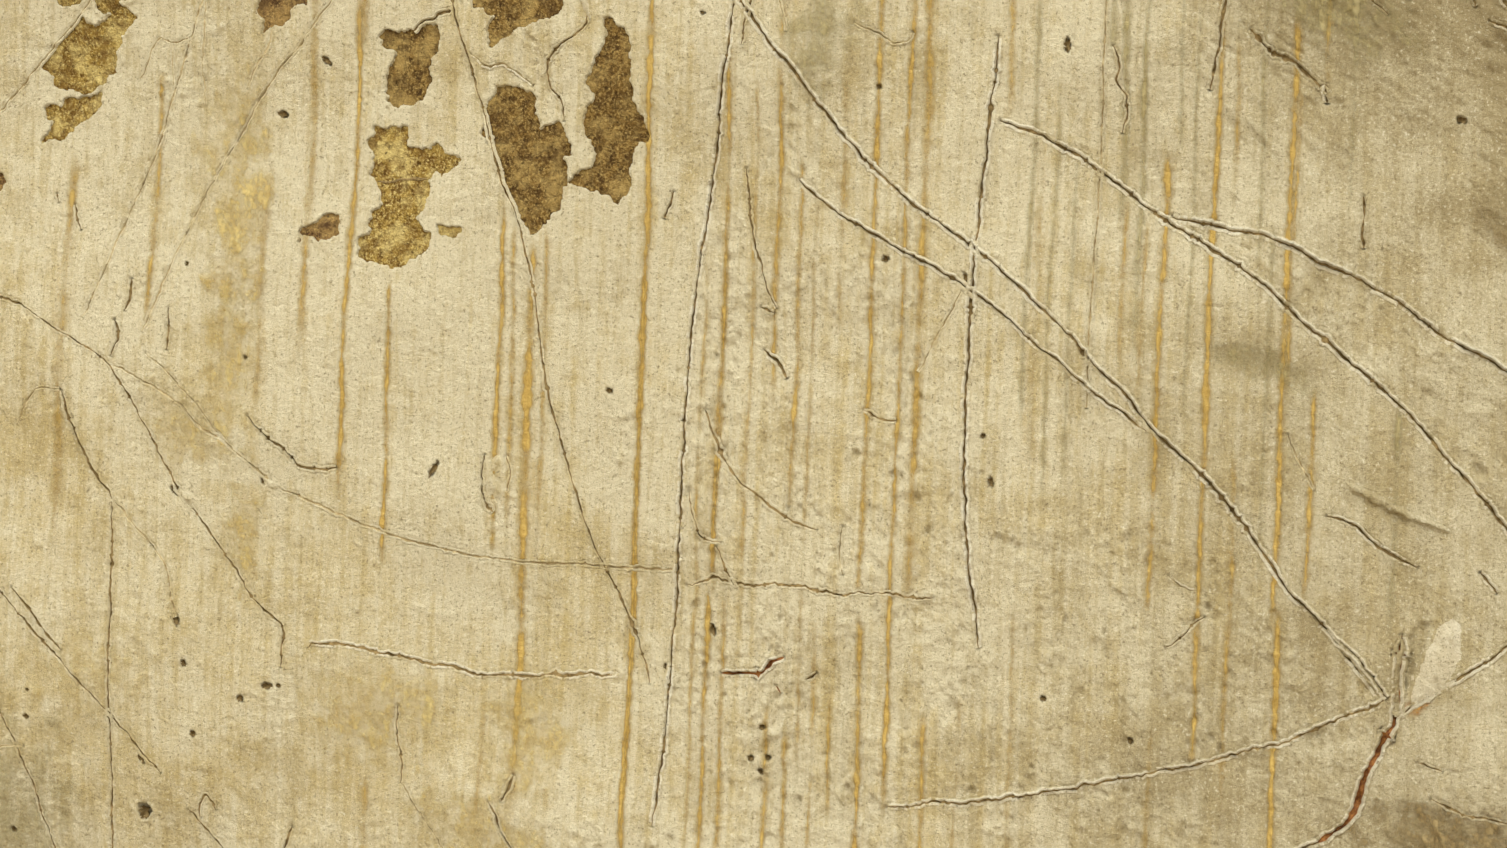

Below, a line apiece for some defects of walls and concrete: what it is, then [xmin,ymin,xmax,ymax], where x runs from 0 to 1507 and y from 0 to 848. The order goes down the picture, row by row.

crack [0,385,178,848]
peeling [42,0,137,143]
corrosion [336,0,366,470]
peeling [379,21,440,108]
peeling [358,126,462,269]
crack [0,0,933,683]
corrosion [492,219,548,784]
peeling [472,0,650,235]
corrosion [618,0,654,848]
crack [721,654,818,694]
corrosion [882,0,934,795]
crack [1207,0,1333,103]